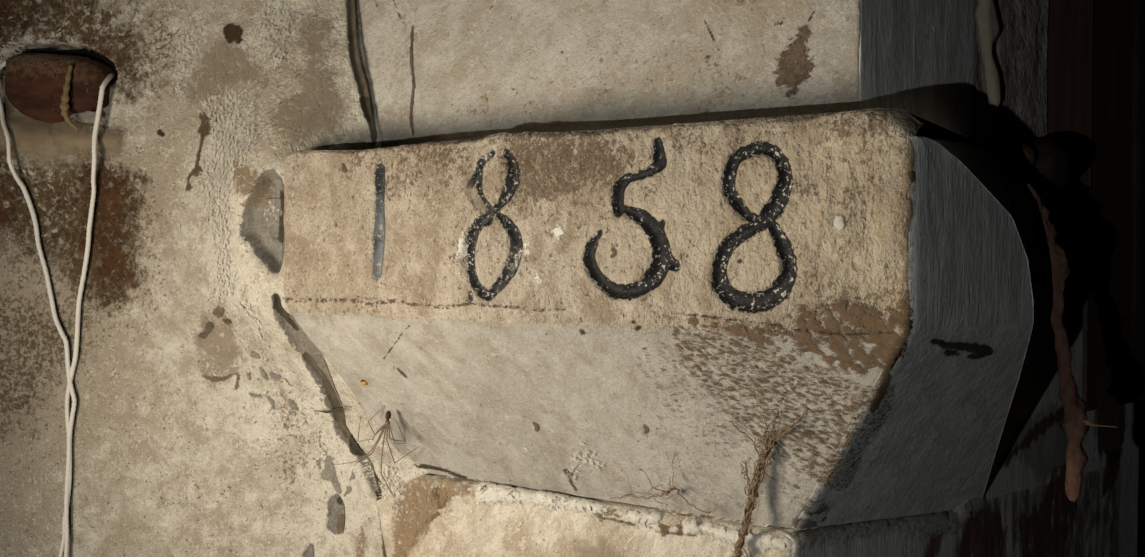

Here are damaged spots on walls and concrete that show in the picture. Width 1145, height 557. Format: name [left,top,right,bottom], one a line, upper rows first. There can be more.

leakage [0,0,180,99]
crack [346,0,415,146]
leakage [0,147,148,431]
peeling [636,290,913,529]